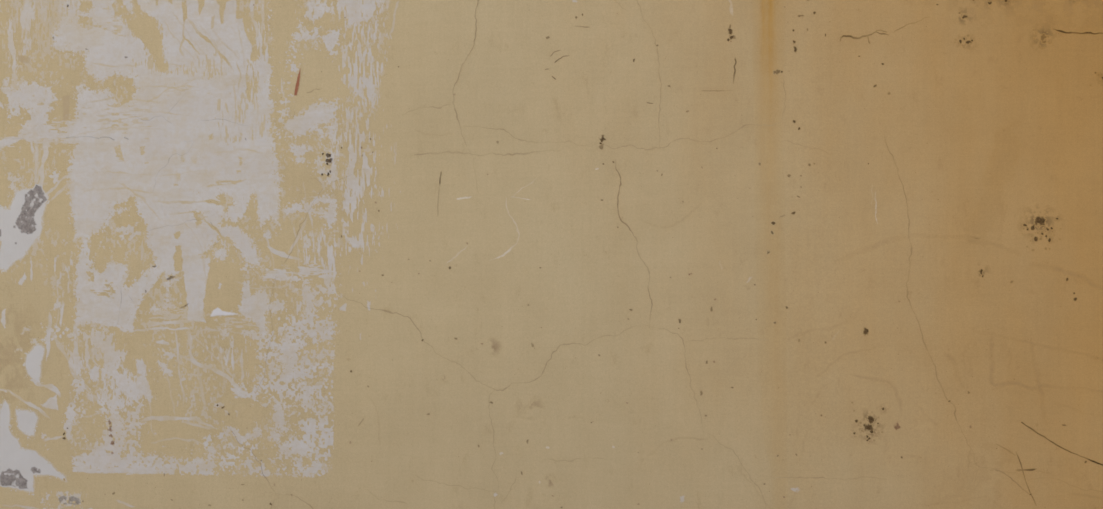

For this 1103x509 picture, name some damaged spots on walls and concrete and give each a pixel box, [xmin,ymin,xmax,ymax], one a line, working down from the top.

peeling [0,0,403,509]
crack [337,0,760,509]
crack [840,17,929,44]
crack [1052,27,1103,35]